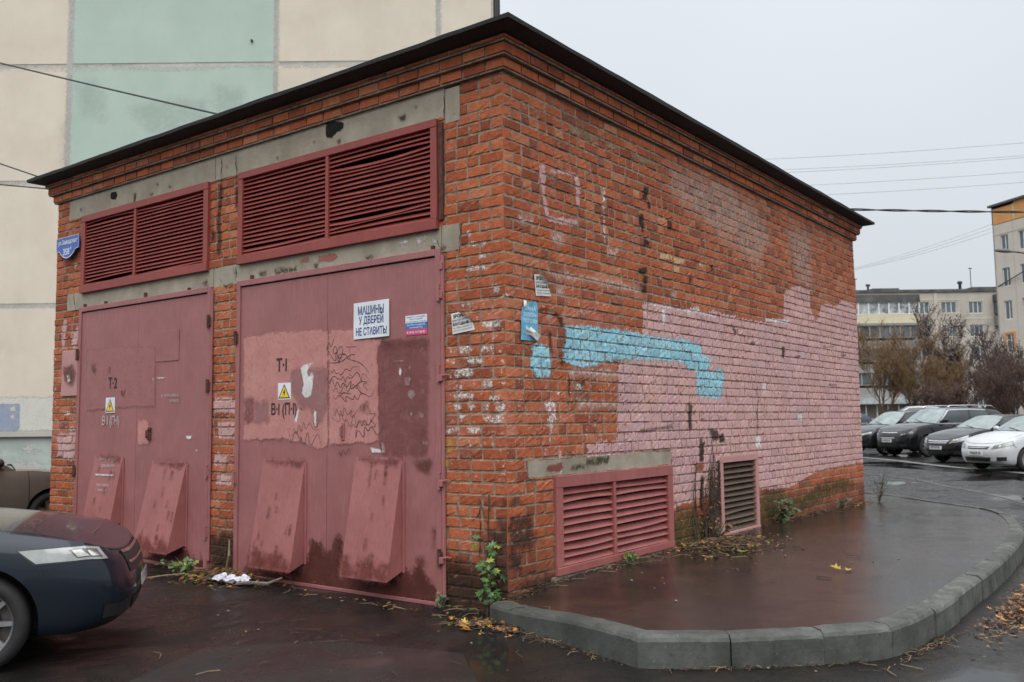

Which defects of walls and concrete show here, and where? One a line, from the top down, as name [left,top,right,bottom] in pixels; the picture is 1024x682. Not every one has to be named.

peeling [301,363,314,398]
damp [699,461,722,541]
rust [244,534,436,602]
damp [446,561,507,611]